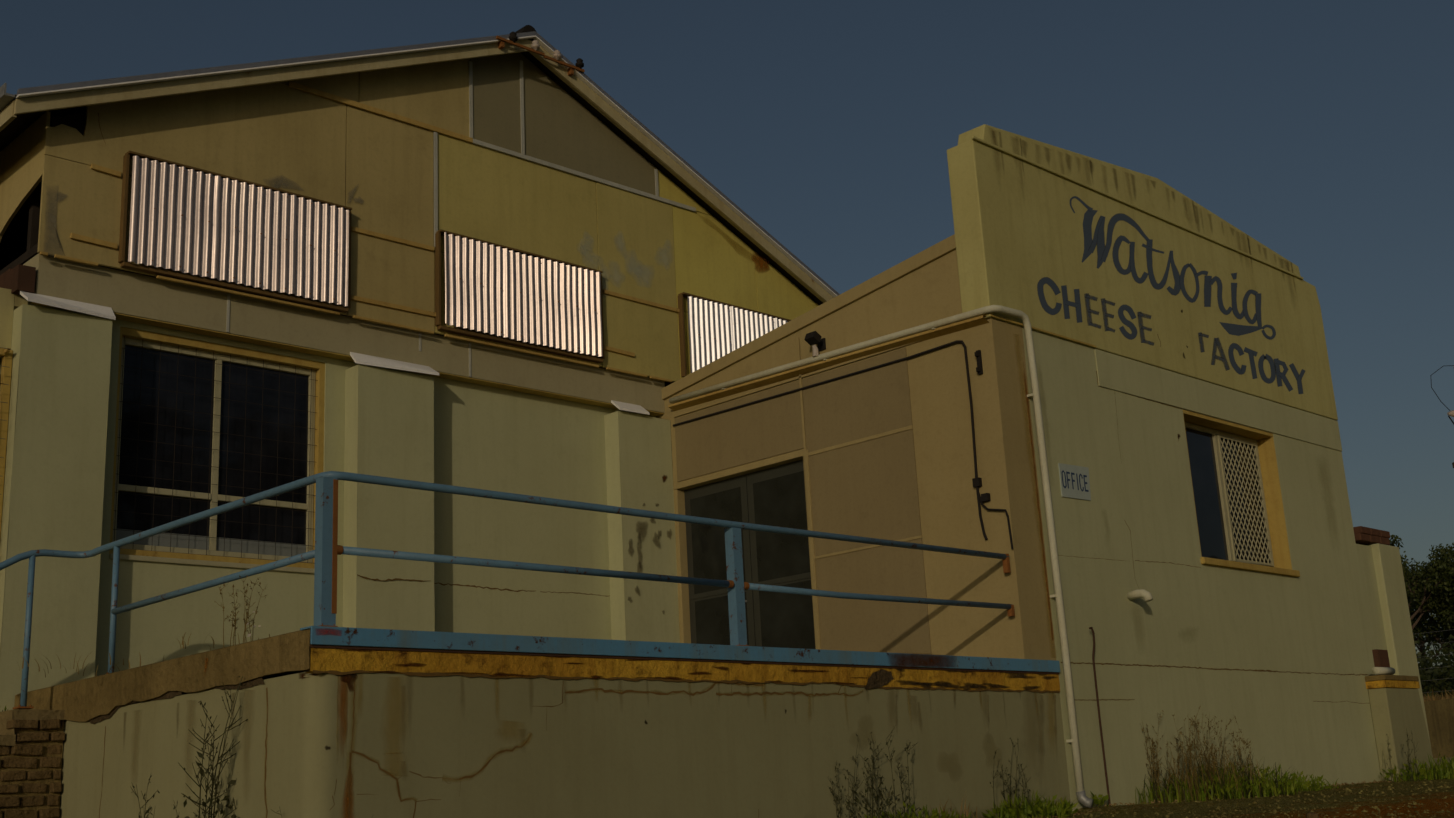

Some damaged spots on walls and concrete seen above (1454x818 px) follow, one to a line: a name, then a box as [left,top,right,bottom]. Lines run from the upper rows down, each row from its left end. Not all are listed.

crack [358,575,608,597]
spalling [336,673,357,691]
spalling [865,666,1055,690]
crack [330,680,863,818]